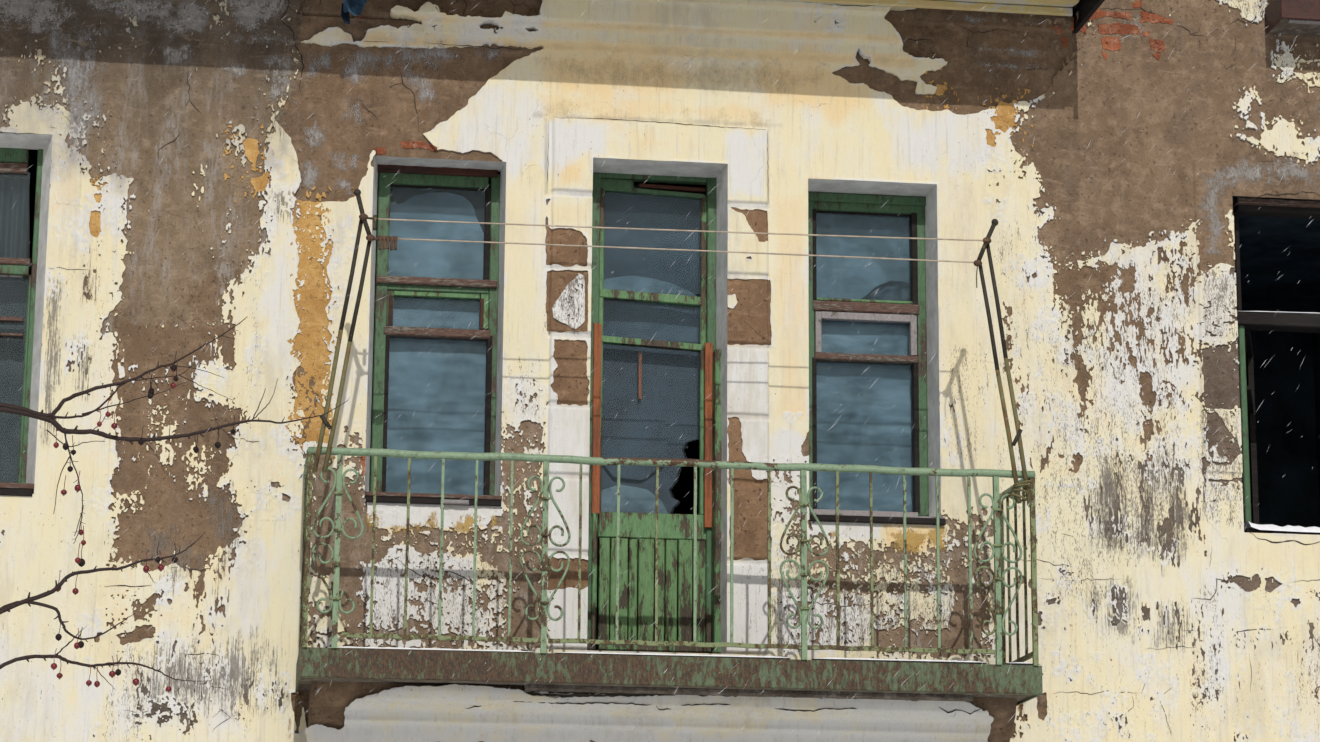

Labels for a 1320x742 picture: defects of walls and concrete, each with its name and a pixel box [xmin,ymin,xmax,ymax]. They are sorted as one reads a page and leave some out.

spalling [732,207,768,242]
spalling [727,279,771,346]
peeling [833,0,1320,568]
peeling [0,0,590,740]
peeling [727,417,995,661]
water stain [1090,460,1193,570]
peeling [1031,593,1060,629]
water stain [1087,580,1139,642]
water stain [1154,603,1195,649]
peeling [1059,565,1314,728]